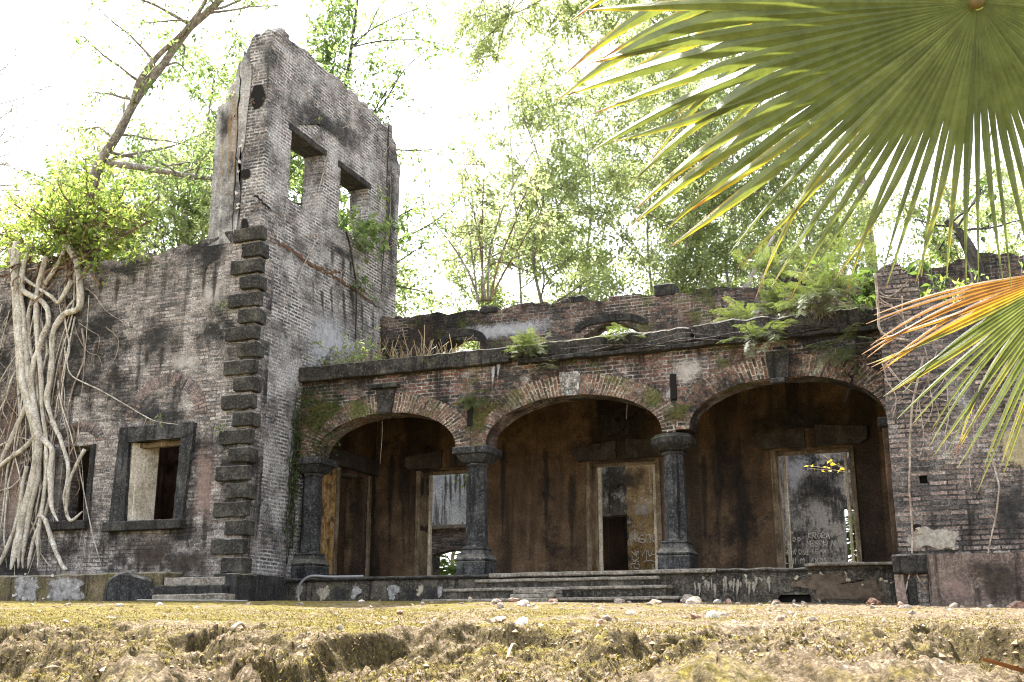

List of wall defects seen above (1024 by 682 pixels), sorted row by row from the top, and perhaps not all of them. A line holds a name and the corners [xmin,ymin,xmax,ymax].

crack [231,73,272,231]
water stain [328,243,352,277]
water stain [142,319,198,371]
water stain [143,406,181,423]
water stain [799,470,838,500]
peeling [12,573,85,601]
spalling [771,571,893,600]